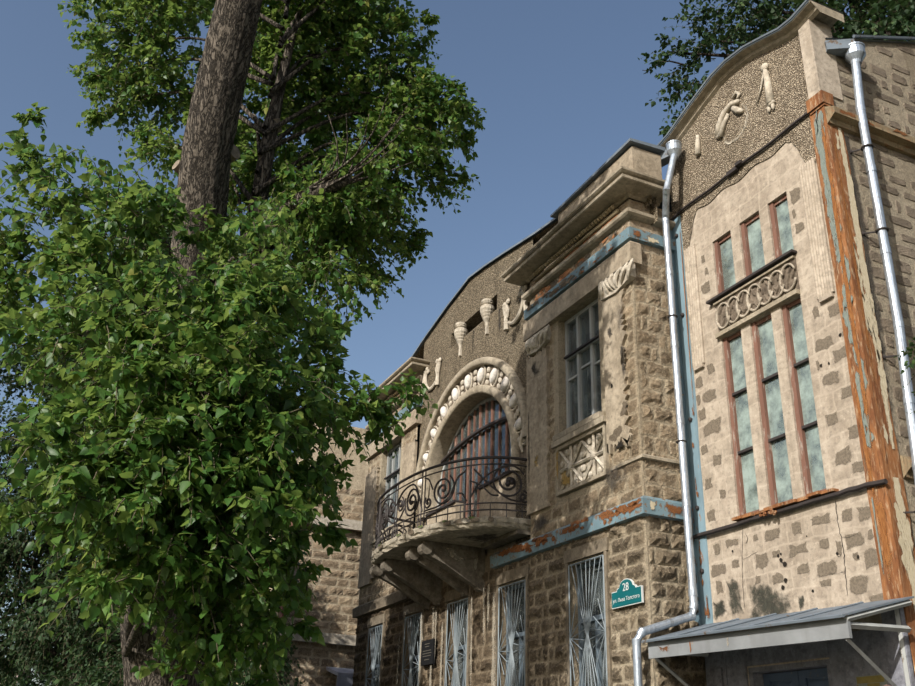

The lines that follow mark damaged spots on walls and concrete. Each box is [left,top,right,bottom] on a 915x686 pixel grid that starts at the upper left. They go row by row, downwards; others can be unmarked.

spalling [526,215,617,312]
peeling [812,110,895,473]
crack [835,500,856,590]
peeling [893,477,915,610]
mould [713,579,804,618]